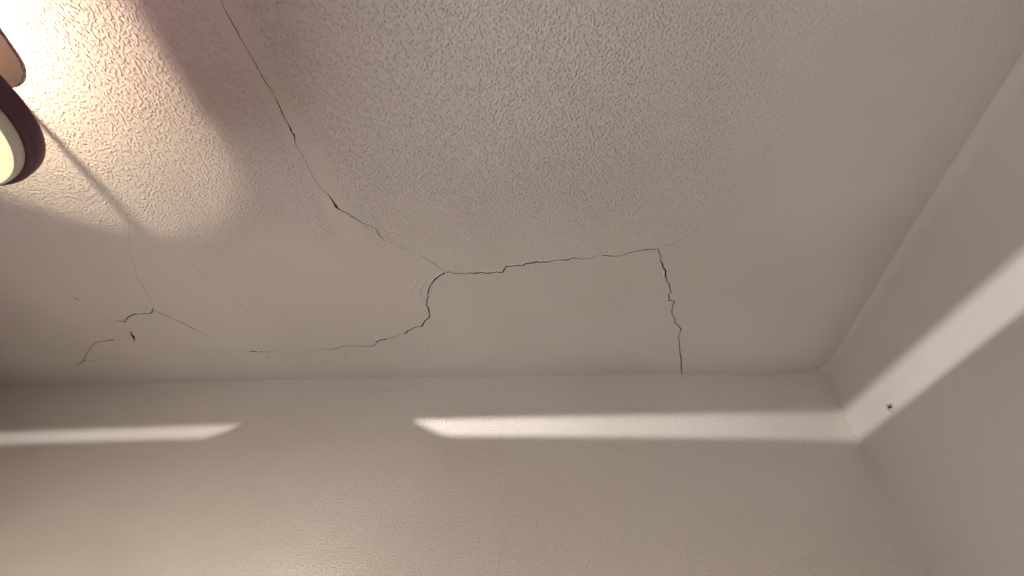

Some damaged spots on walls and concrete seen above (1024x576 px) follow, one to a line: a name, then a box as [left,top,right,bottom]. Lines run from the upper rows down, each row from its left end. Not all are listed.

crack [221,1,296,144]
crack [326,193,381,237]
crack [78,308,195,365]
crack [320,248,683,375]